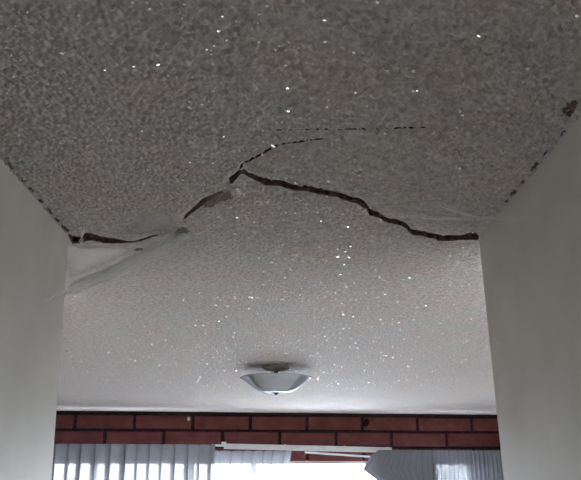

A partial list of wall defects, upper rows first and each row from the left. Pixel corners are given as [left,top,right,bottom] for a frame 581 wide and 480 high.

crack [8,162,175,252]
crack [183,196,208,219]
crack [229,127,479,241]
peeling [67,245,126,273]